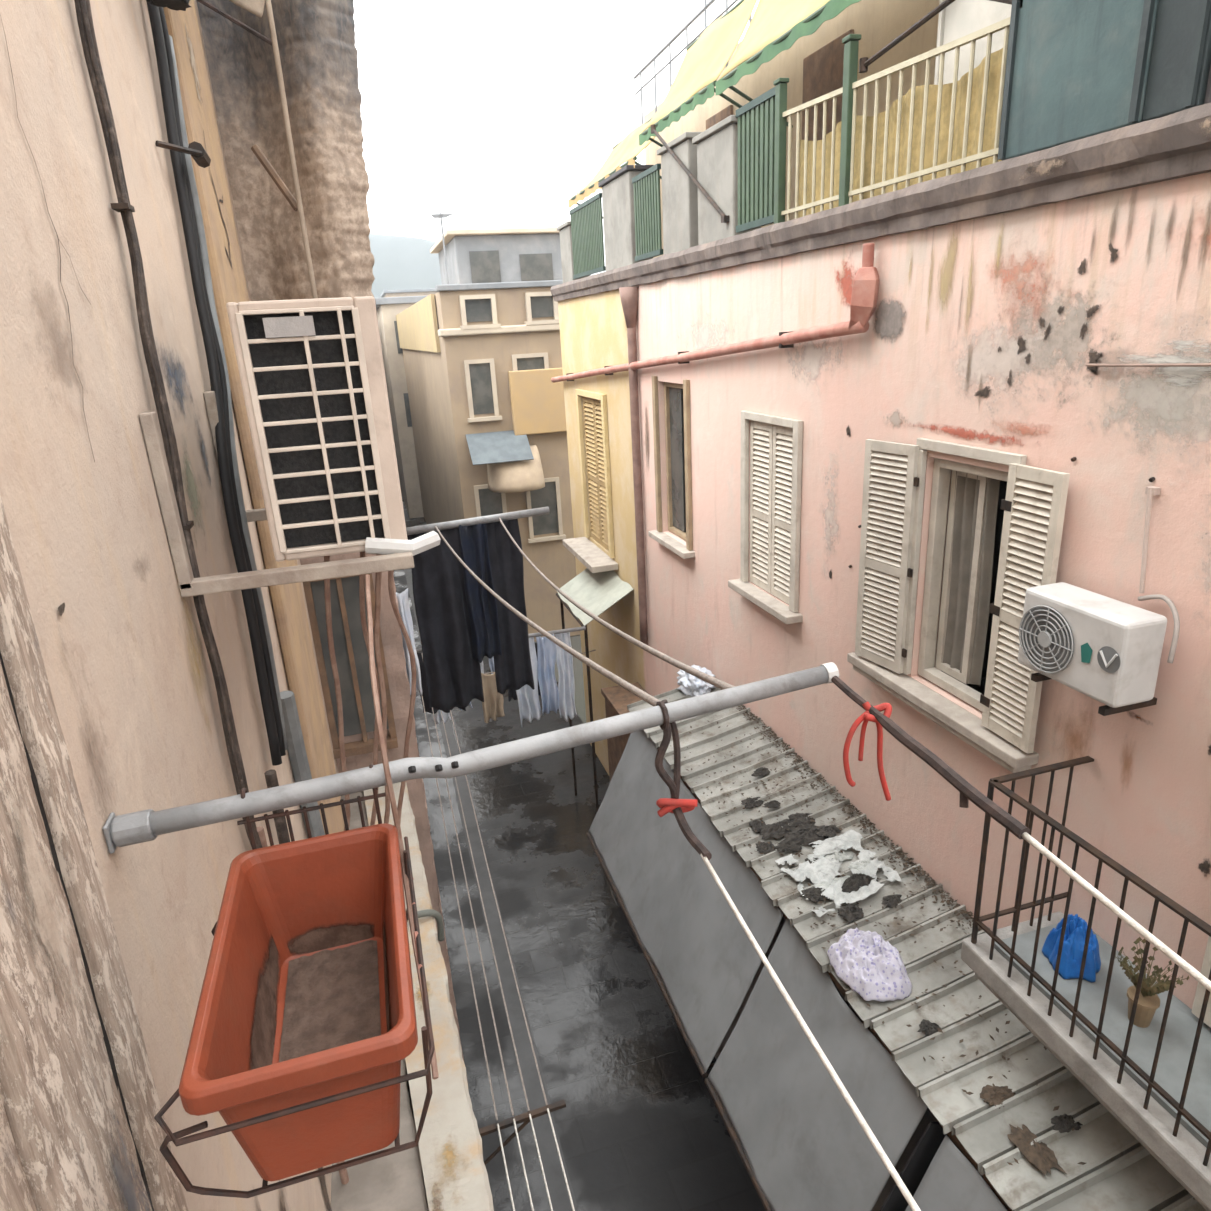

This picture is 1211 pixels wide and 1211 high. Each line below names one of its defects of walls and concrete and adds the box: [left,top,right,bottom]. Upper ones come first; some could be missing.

crack [0,15,95,462]
damp [1178,206,1211,288]
peeling [958,255,1113,397]